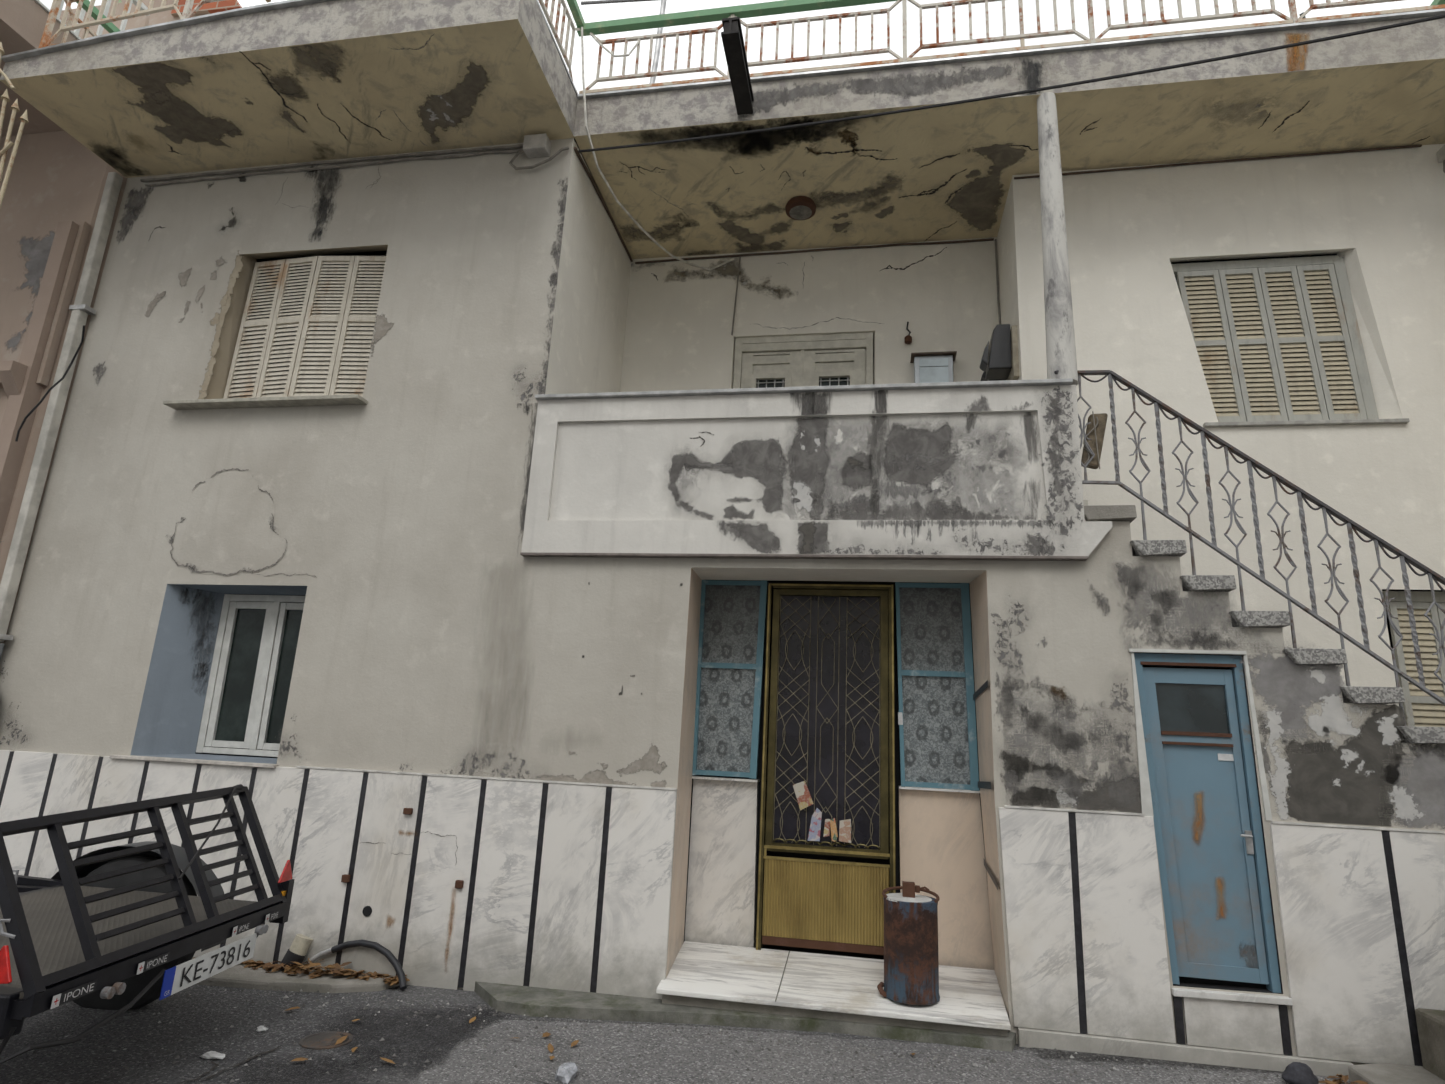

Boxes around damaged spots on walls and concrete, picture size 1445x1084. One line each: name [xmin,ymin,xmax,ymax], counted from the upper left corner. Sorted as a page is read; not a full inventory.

corrosion [1287,34,1308,71]
flaking render [113,63,242,147]
crack [239,51,427,187]
water stain [814,175,901,212]
flaking render [949,143,1026,231]
water stain [669,260,791,298]
peeling [669,439,787,520]
peeling [839,423,1018,513]
water stain [1091,566,1230,650]
water stain [996,675,1126,803]
peeling [1240,647,1445,829]
corrosion [1194,793,1203,842]